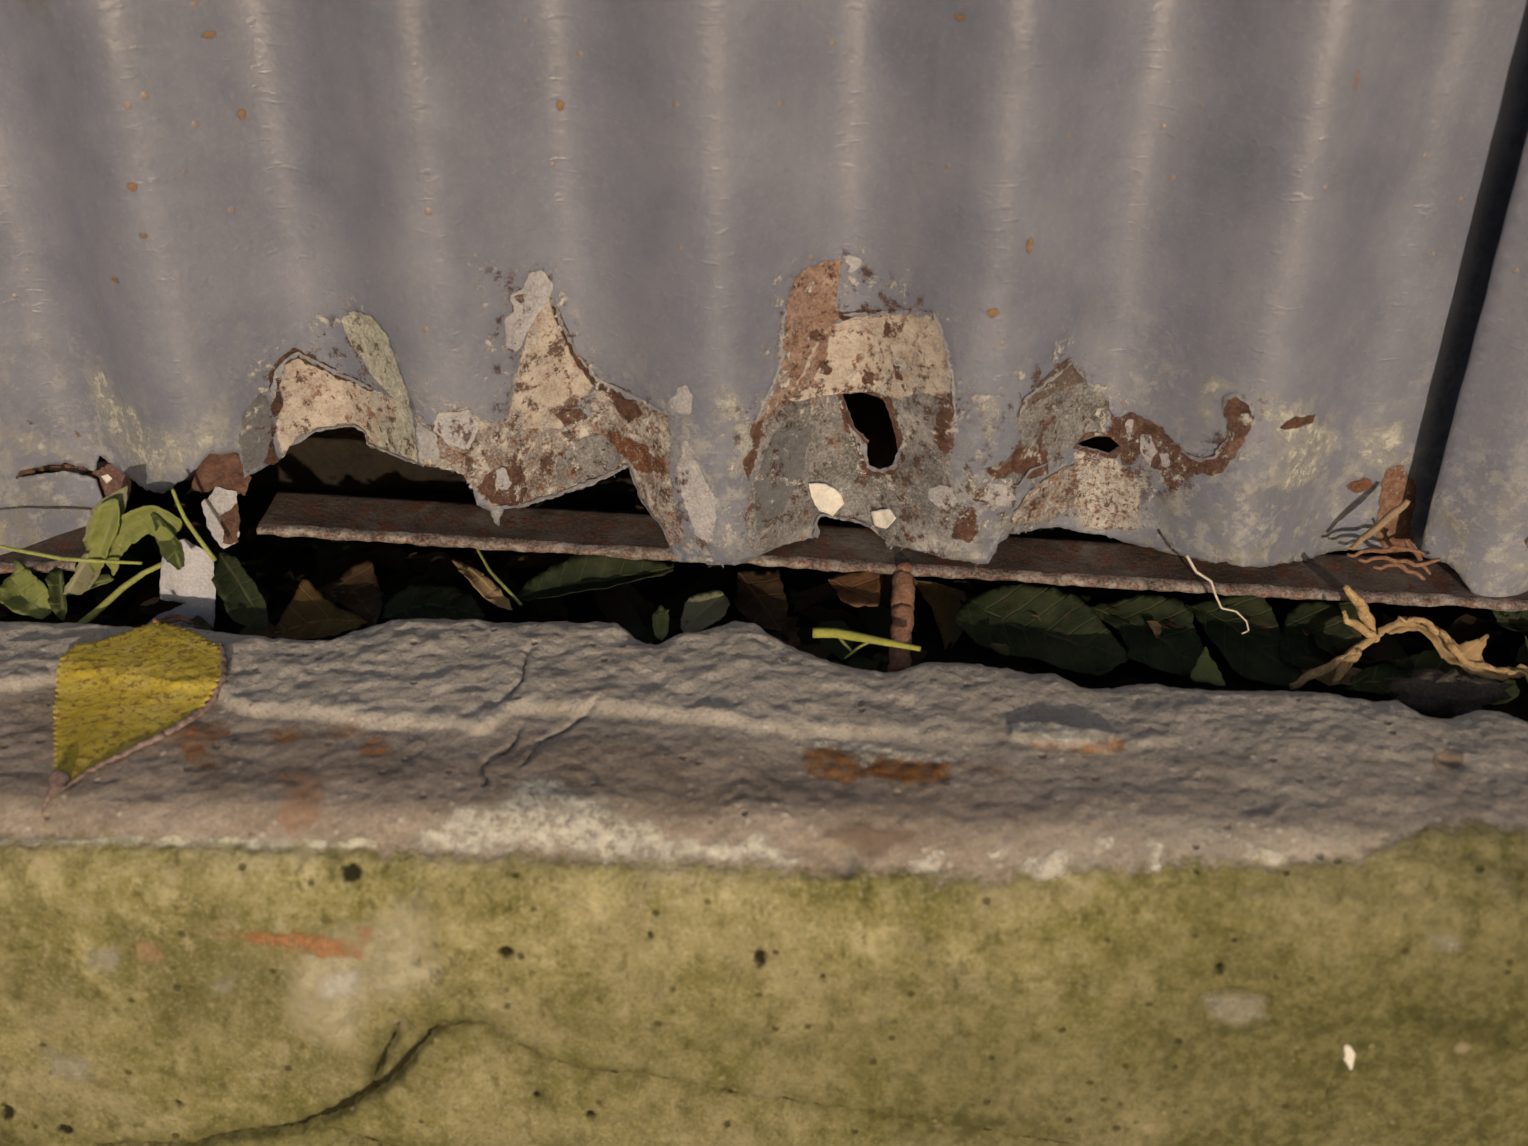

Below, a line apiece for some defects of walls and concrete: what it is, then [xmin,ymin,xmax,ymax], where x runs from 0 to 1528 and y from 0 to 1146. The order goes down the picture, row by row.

water stain [92,370,227,475]
peeling [473,254,693,445]
peeling [677,439,718,543]
peeling [754,246,977,535]
corrosion [735,338,1263,558]
peeling [1072,450,1141,530]
corrosion [1279,414,1316,430]
corrosion [804,741,956,784]
efflorescence [416,778,799,867]
crack [203,1022,495,1146]